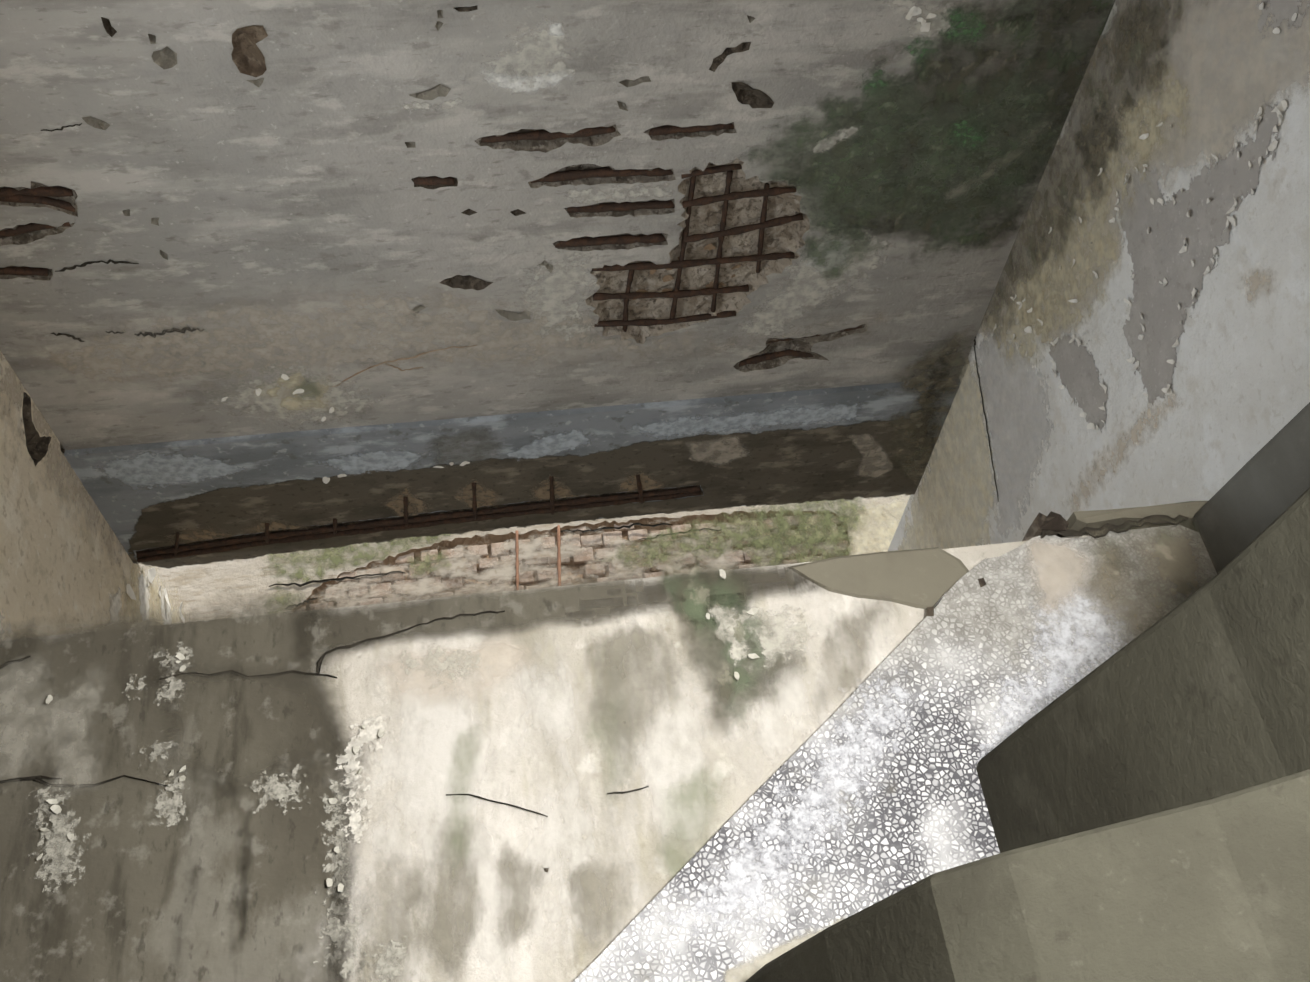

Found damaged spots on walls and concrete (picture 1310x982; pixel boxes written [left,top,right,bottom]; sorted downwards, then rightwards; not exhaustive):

spalling [0,181,78,246]
spalling [231,25,268,87]
spalling [475,125,621,153]
spalling [528,158,810,344]
water stain [978,0,1310,360]
peeling [1114,99,1288,404]
water stain [849,333,996,555]
crack [0,655,31,669]
crack [160,610,505,680]
water stain [709,566,817,756]
crack [0,775,168,787]
water stain [0,575,704,982]